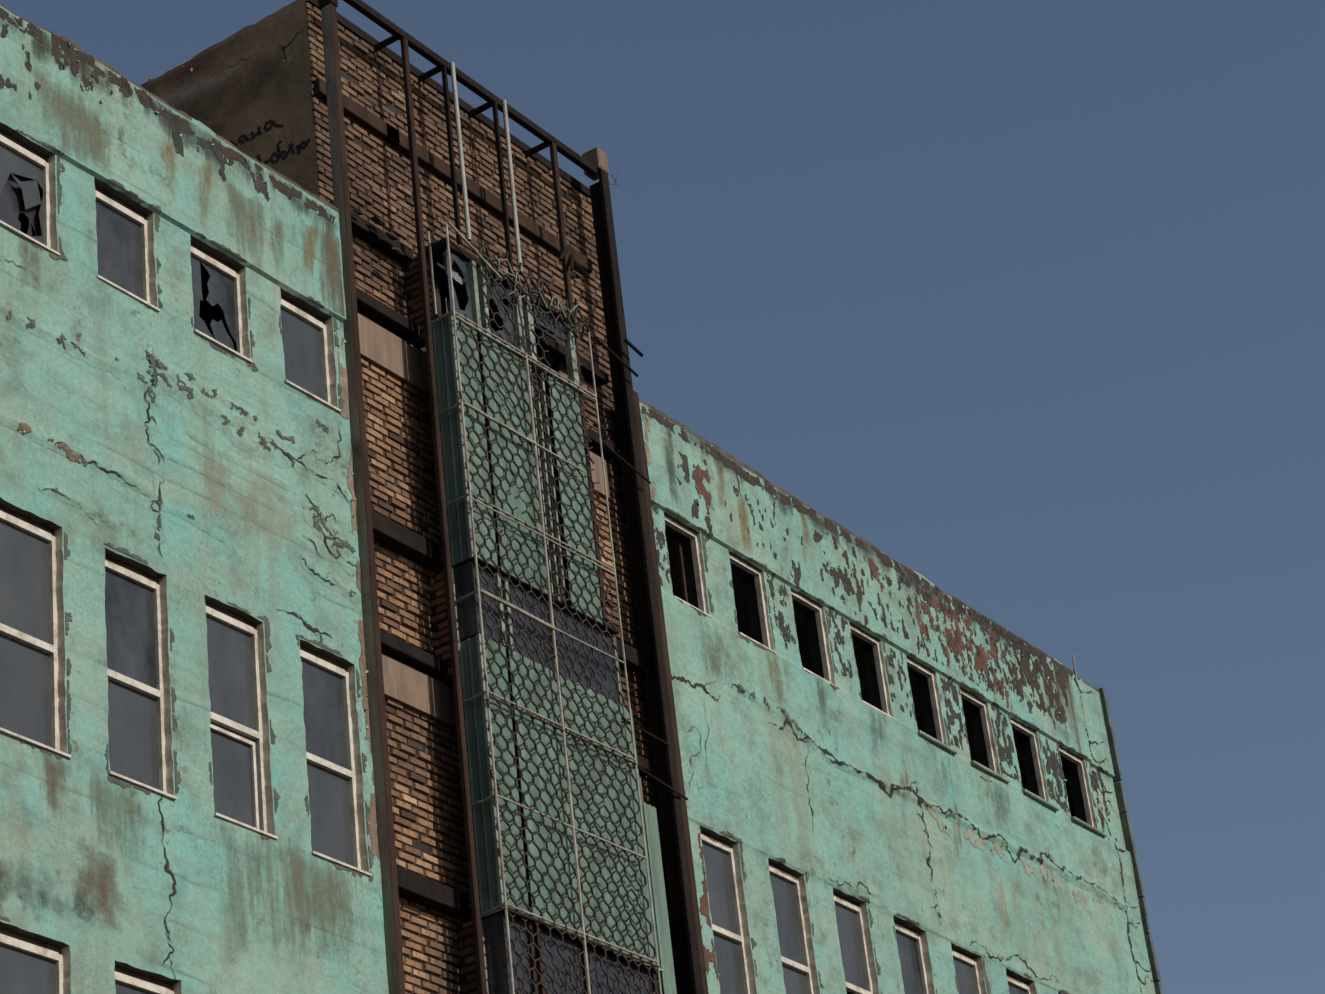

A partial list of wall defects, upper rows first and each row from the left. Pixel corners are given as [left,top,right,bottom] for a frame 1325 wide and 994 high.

spalling [31,236,68,261]
spalling [108,179,162,232]
spalling [141,258,163,312]
peeling [0,8,335,223]
spalling [196,232,247,263]
crack [55,355,165,558]
crack [266,430,355,596]
peeling [641,406,1118,842]
crack [158,796,178,980]
crack [671,668,1153,992]